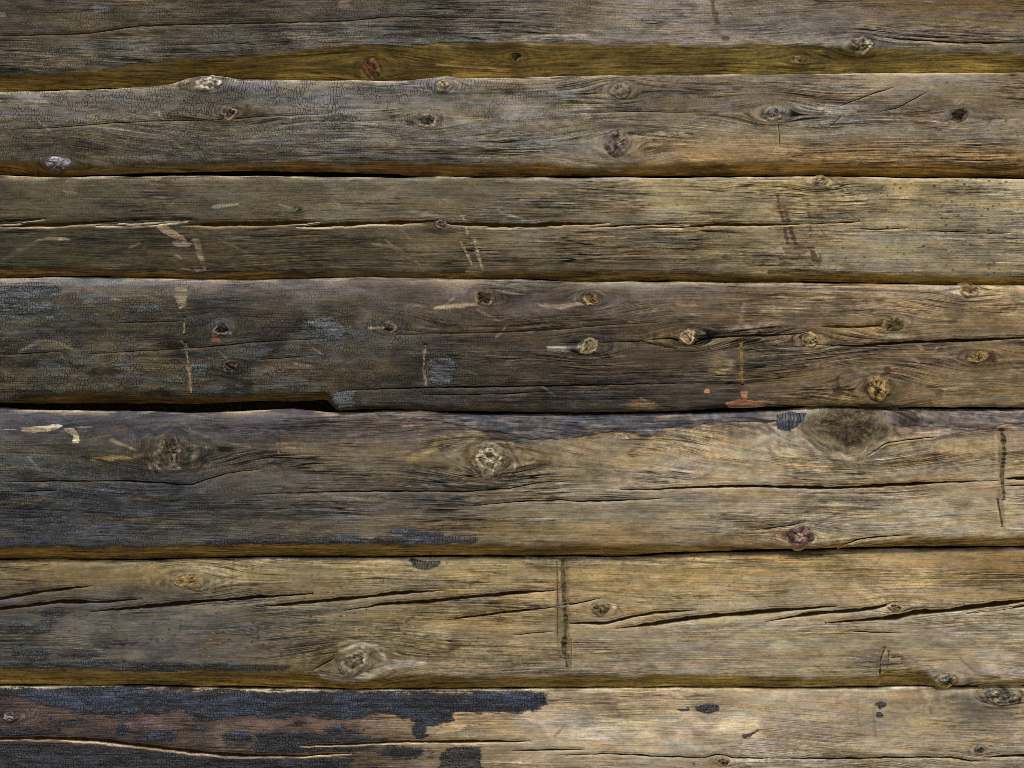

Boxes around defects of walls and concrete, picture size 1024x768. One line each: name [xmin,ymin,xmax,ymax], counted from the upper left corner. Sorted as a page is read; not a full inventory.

rust [725,390,771,408]
crack [0,584,1024,637]
peeling [436,710,514,736]